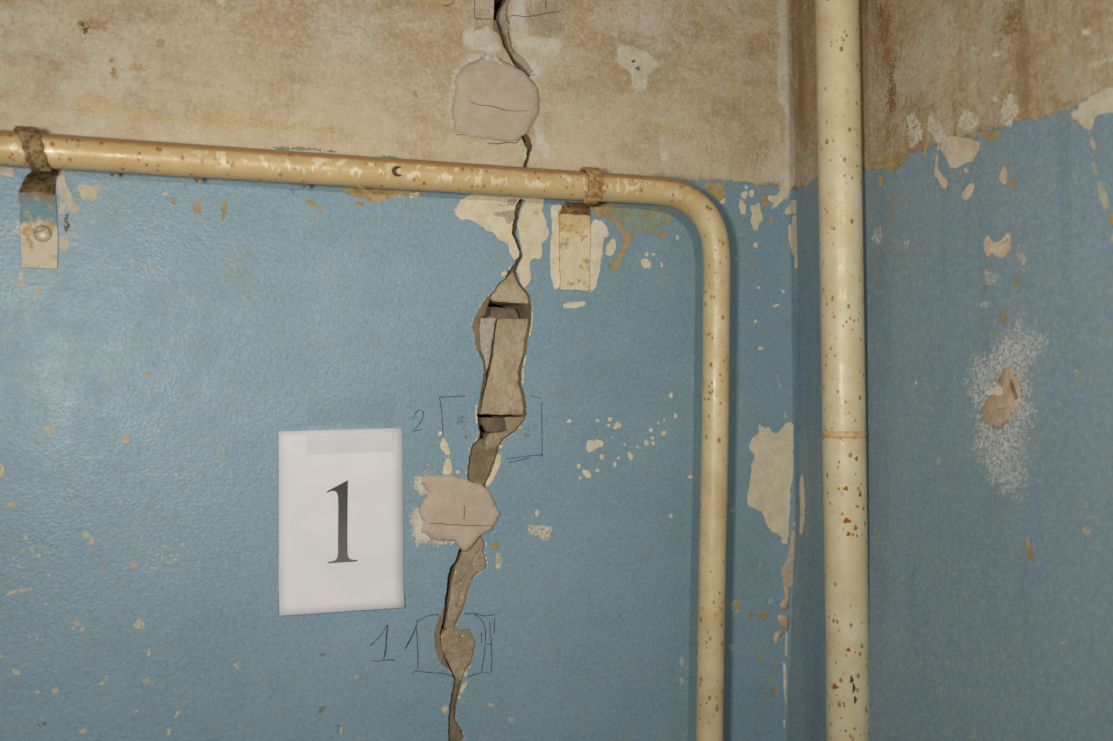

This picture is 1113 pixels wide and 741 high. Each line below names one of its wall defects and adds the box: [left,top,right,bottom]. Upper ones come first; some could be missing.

crack [493,0,532,77]
peeling [54,169,101,252]
crack [467,100,529,144]
peeling [563,203,679,308]
peeling [682,180,725,204]
peeling [739,0,798,307]
peeling [864,94,1040,245]
peeling [1063,87,1113,215]
peeling [576,413,677,479]
peeling [747,412,806,727]
crack [429,506,493,741]